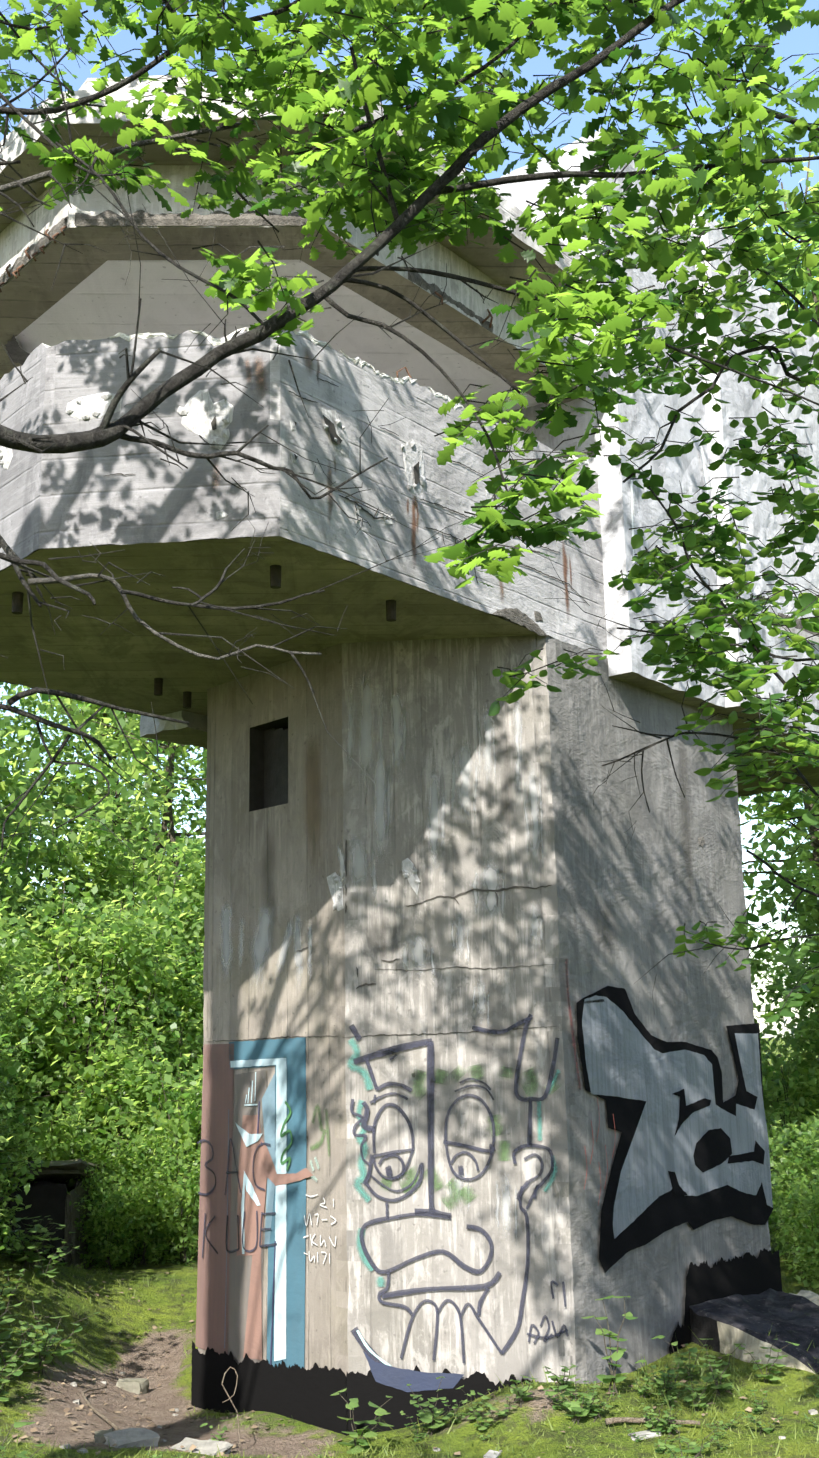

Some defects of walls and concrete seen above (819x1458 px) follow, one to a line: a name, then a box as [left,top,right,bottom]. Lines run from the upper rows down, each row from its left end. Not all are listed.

spalling [293,330,465,410]
spalling [66,392,123,421]
spalling [177,389,234,450]
corrosion [407,500,419,554]
corrosion [563,547,572,609]
spalling [327,872,344,911]
spalling [402,858,421,895]
crack [406,885,551,907]